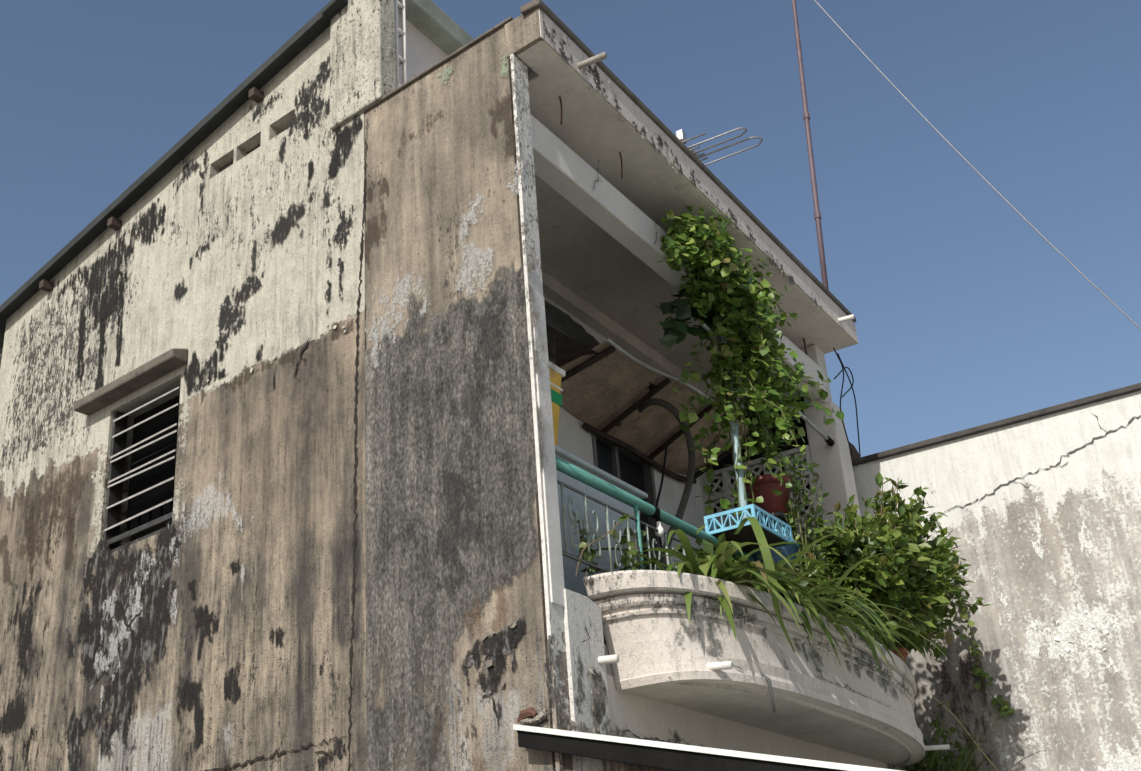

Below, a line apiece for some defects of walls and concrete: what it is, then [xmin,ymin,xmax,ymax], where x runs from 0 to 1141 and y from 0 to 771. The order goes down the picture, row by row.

leakage [244,53,389,313]
peeling [543,21,822,308]
leakage [53,149,209,391]
leakage [174,229,222,304]
leakage [184,239,265,395]
leakage [365,194,551,771]
crack [925,413,1141,519]
leakage [0,447,220,771]
leakage [223,661,241,704]
leakage [269,626,284,647]
peeling [1026,596,1121,679]
peeling [1098,721,1141,771]